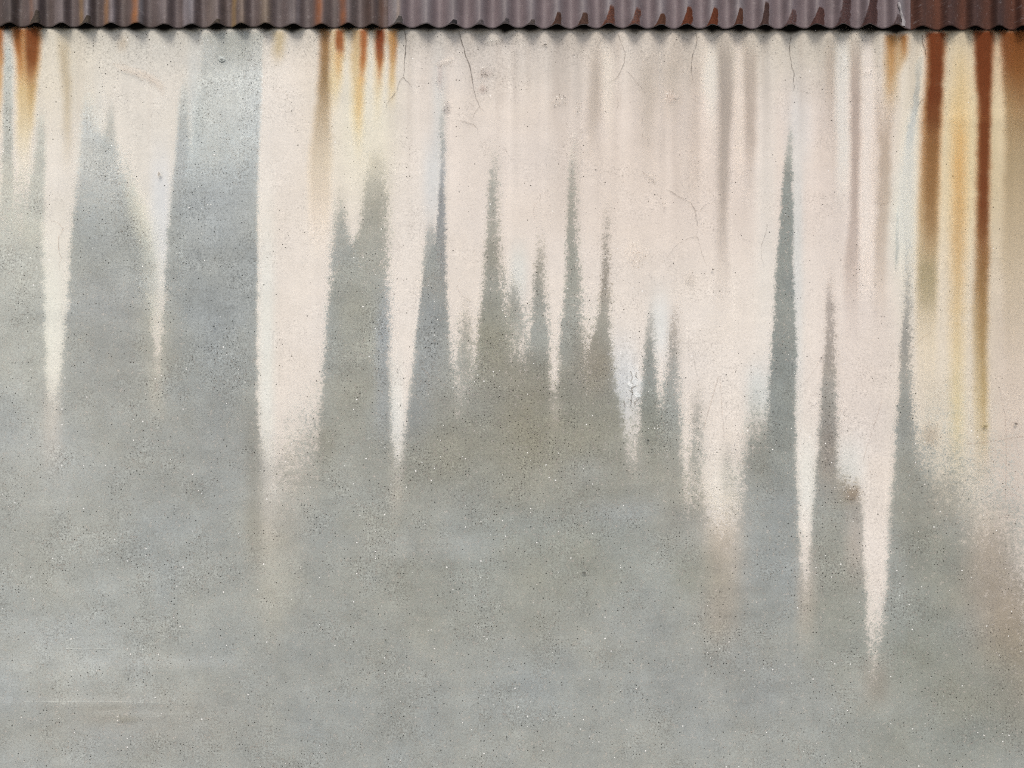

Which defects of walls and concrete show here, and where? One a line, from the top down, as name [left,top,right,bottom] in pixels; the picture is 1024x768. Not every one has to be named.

rust [681,7,693,25]
rust [707,7,718,26]
rust [759,2,770,26]
rust [810,0,878,27]
rust [14,9,41,135]
rust [312,30,395,184]
rust [921,33,945,251]
rust [975,32,1024,368]
water stain [689,403,706,463]